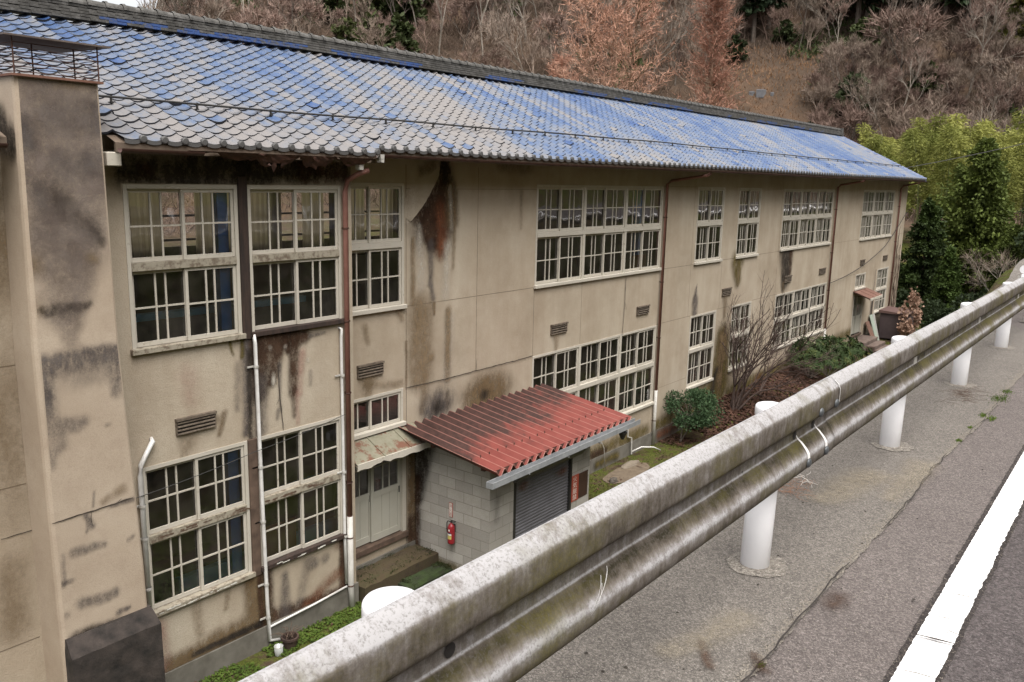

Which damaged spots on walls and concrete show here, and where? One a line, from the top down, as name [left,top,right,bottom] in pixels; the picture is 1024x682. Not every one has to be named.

damp [298,160,351,183]
corrosion [413,161,457,298]
damp [406,237,451,411]
damp [41,345,121,431]
crack [1,498,132,540]